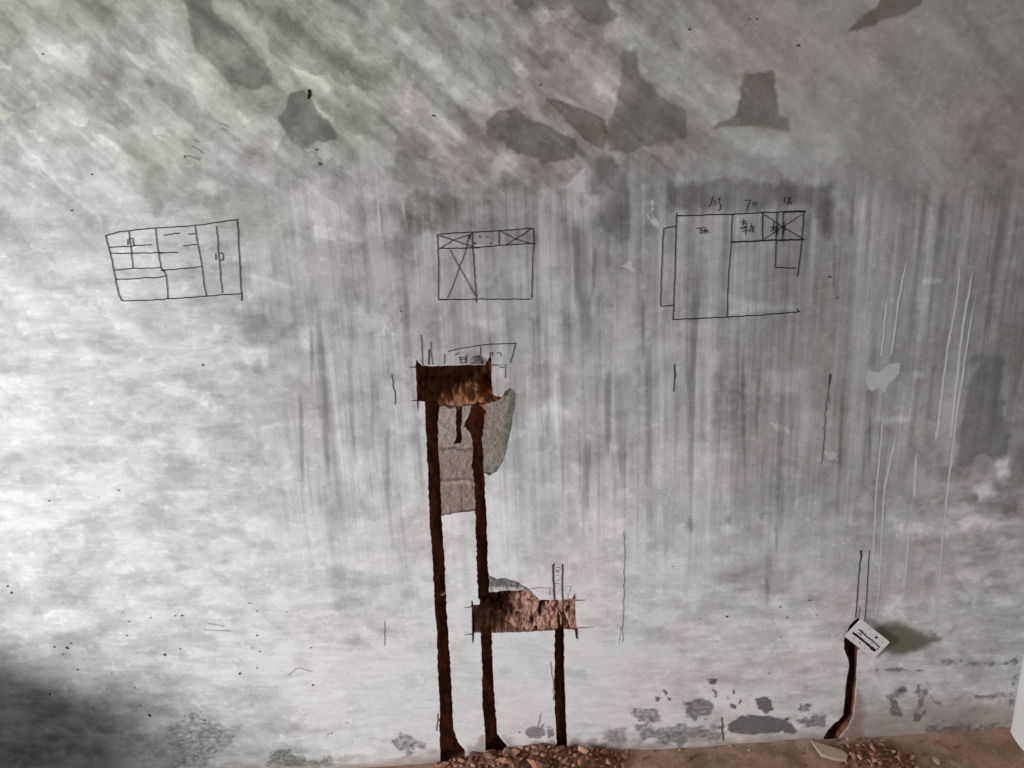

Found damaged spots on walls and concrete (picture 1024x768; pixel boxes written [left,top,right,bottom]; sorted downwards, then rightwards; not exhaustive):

damp [852,0,894,29]
spalling [415,356,516,516]
damp [873,265,972,653]
spalling [472,575,578,642]